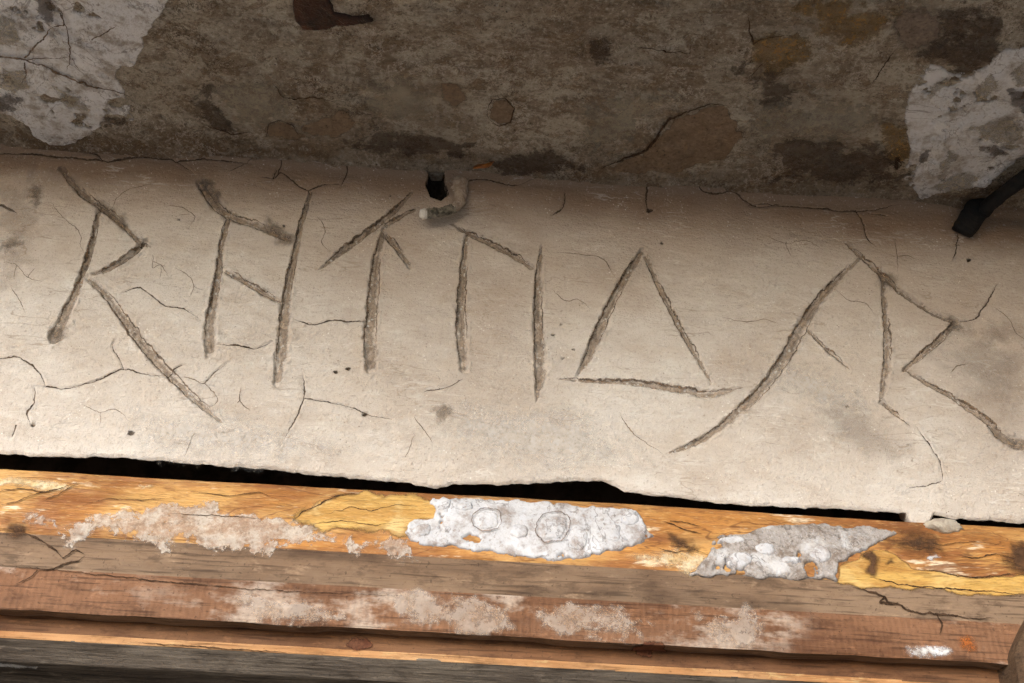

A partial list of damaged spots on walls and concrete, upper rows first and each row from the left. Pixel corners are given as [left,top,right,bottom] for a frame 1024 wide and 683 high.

crack [0,11,129,97]
peeling [0,0,168,146]
crack [601,104,726,169]
peeling [904,47,1024,199]
crack [2,153,348,206]
crack [125,257,203,320]
crack [293,317,361,325]
crack [964,289,1024,339]
crack [0,341,273,437]
crack [280,379,432,457]
crack [909,434,943,488]
crack [852,541,1024,633]